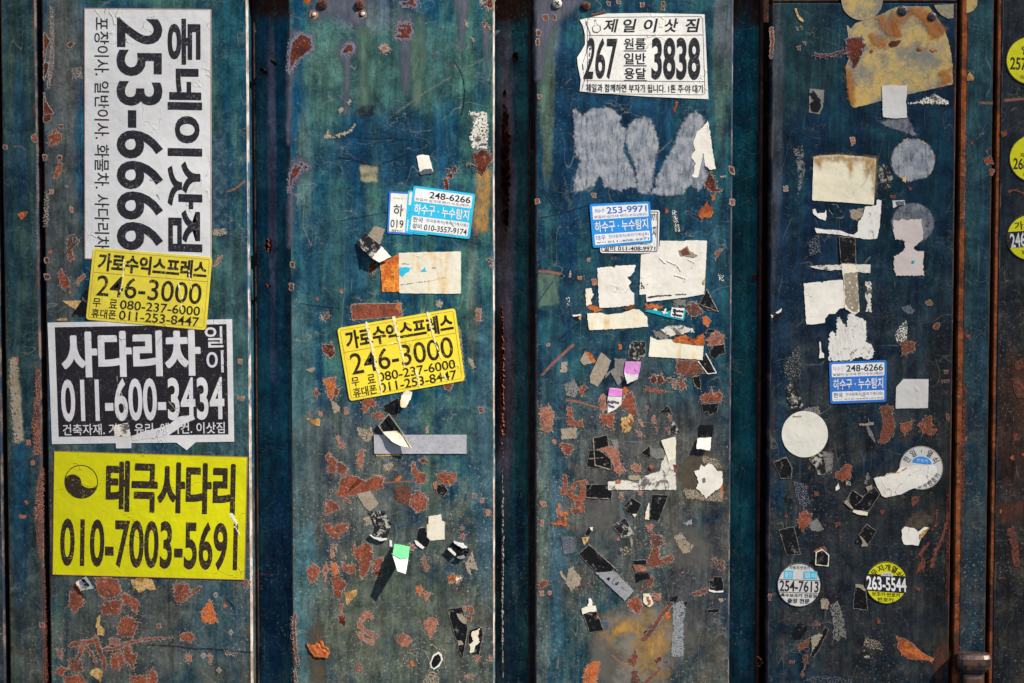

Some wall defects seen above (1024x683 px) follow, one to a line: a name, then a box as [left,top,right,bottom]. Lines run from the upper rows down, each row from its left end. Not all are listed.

corrosion [18,133,62,280]
corrosion [682,486,724,502]